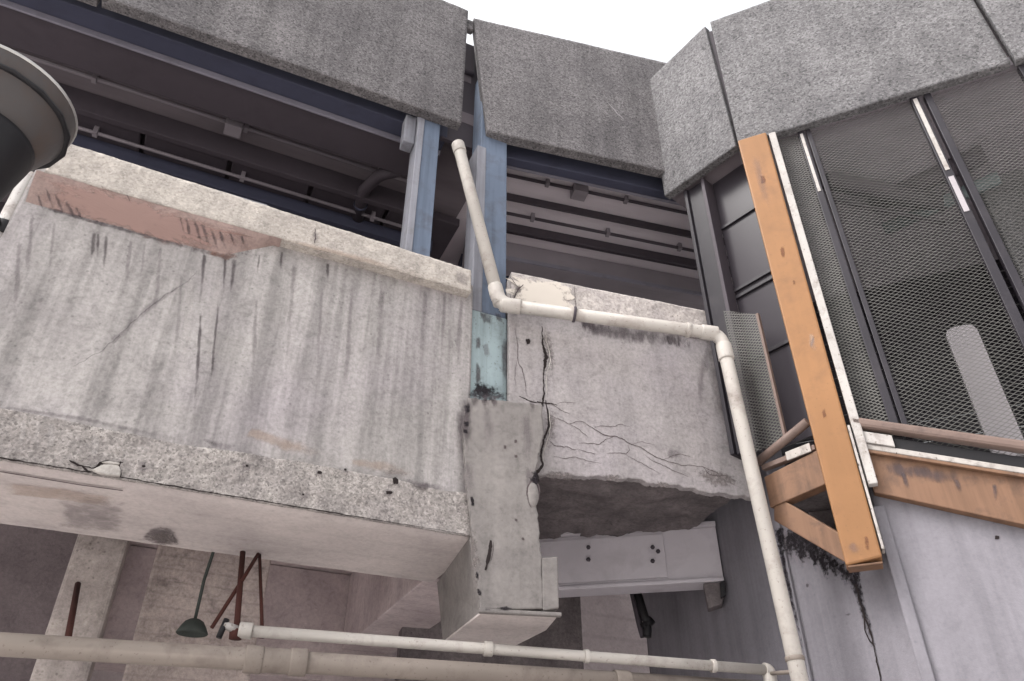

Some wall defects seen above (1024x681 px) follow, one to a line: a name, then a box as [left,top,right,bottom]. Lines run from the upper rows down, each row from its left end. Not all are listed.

spalling [92,461,121,477]
damp [461,384,504,435]
crack [515,327,734,482]
damp [776,528,881,681]